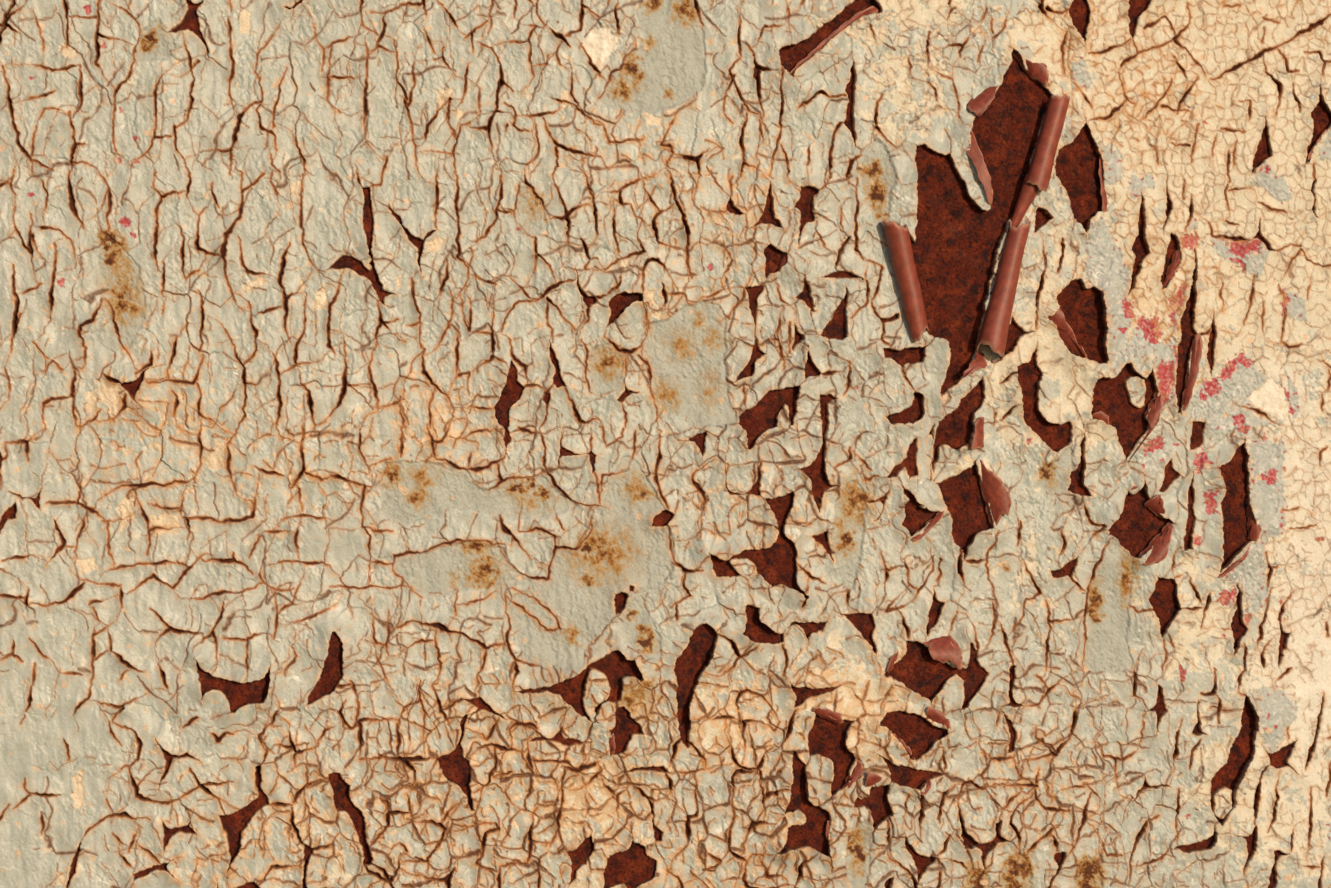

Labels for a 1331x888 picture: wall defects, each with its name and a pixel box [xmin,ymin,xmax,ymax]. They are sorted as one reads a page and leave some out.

peeling [776,0,885,81]
crack [908,0,1331,412]
crack [0,0,916,888]
peeling [490,456,720,757]
peeling [562,812,672,888]
peeling [604,182,1031,888]
crack [982,371,1023,427]
peeling [864,46,1208,674]
crack [879,495,1317,888]
peeling [1216,436,1263,658]
crack [1234,401,1286,428]
crack [1253,726,1331,870]